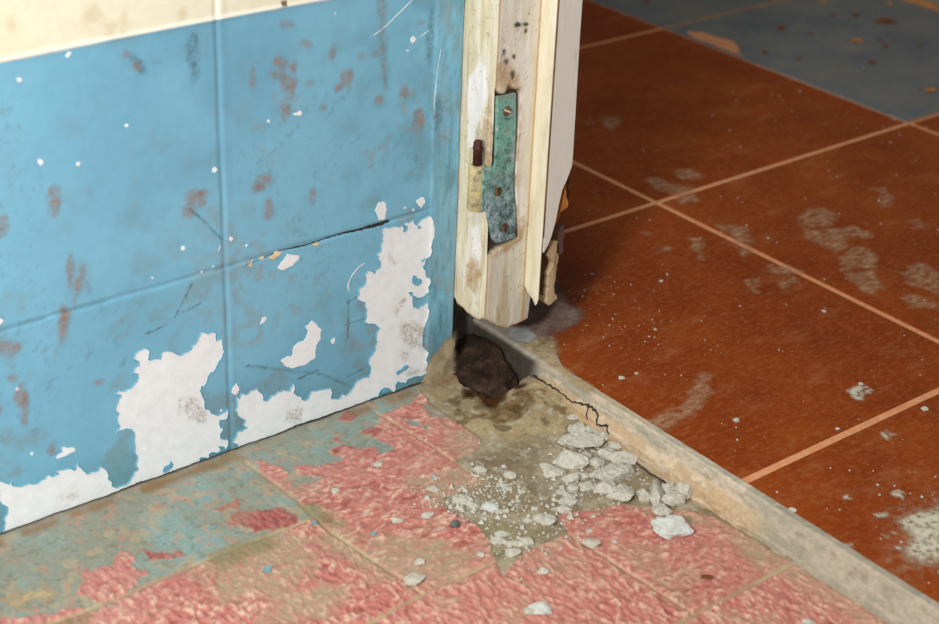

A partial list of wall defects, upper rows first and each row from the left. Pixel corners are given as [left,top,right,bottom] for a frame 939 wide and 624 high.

crack [245,220,390,267]
water stain [807,227,879,293]
peeling [0,197,456,533]
crack [532,374,609,435]